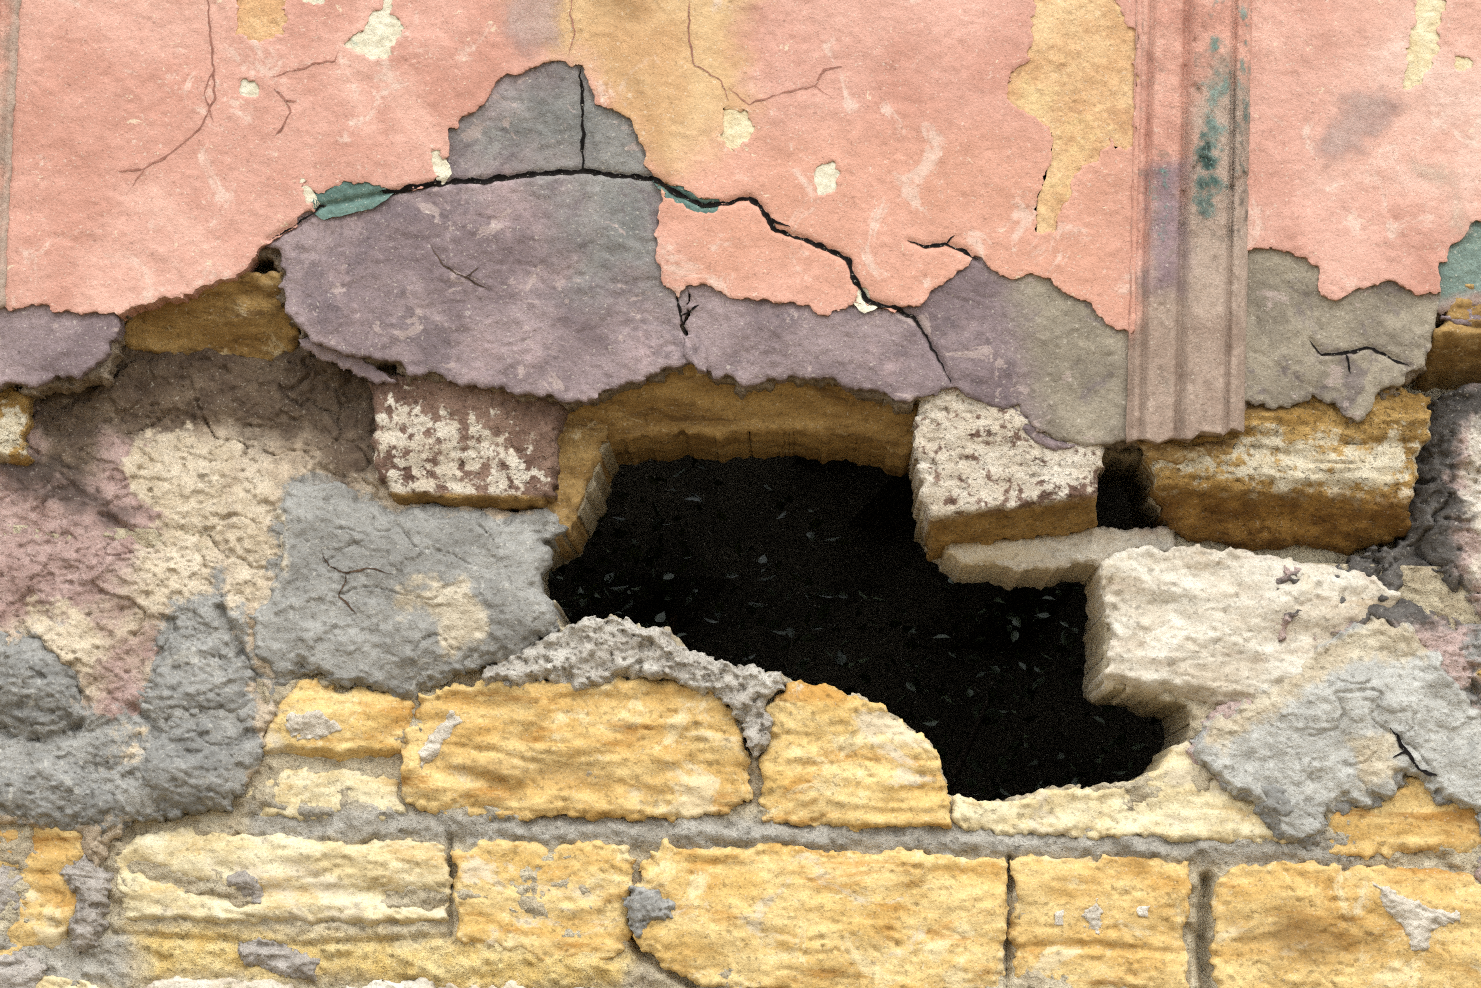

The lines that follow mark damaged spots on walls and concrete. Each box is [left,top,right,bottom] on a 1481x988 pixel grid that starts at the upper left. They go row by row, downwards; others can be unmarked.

peeling [235,0,325,42]
crack [272,205,326,239]
peeling [344,0,405,60]
crack [380,0,951,383]
crack [909,235,978,260]
peeling [1007,0,1139,234]
peeling [1322,0,1473,155]
spalling [0,61,1237,868]